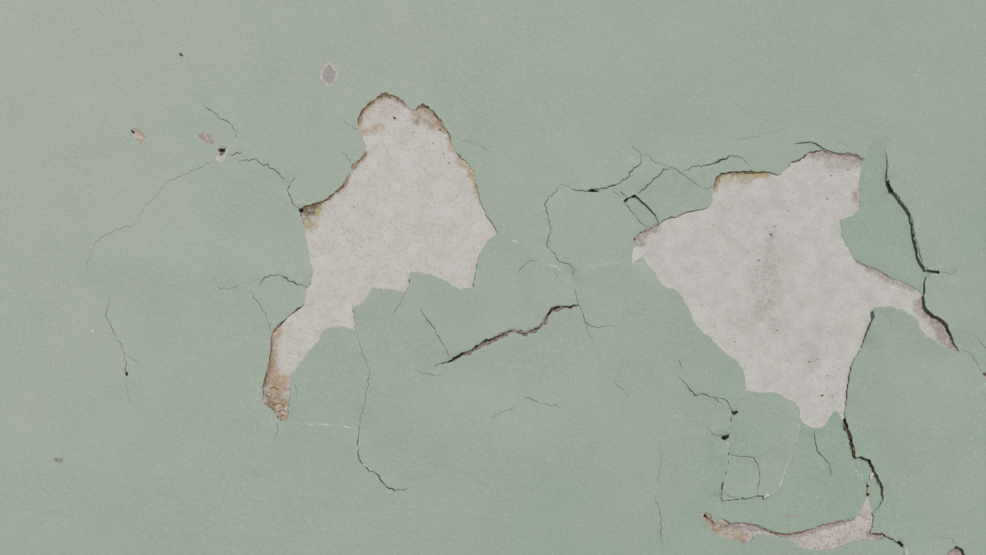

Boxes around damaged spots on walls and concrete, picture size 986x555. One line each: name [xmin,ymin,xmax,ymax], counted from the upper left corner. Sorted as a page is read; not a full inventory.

crack [204,106,297,208]
crack [105,302,137,396]
crack [214,275,304,329]
peeling [261,93,497,420]
crack [393,129,783,376]
peeling [631,148,958,428]
crack [887,180,955,274]
crack [274,333,405,491]
peeling [702,496,884,551]